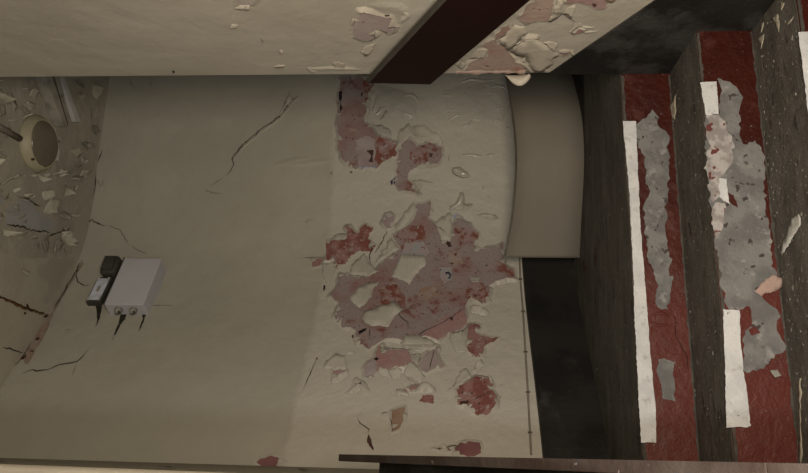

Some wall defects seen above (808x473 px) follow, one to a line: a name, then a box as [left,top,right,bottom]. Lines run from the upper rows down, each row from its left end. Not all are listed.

peeling [349,6,402,56]
peeling [455,0,617,86]
peeling [0,77,104,260]
crack [54,259,88,308]
crack [212,93,300,185]
peeling [305,74,519,435]
peeling [636,110,673,309]
peeling [704,78,801,378]
crack [3,344,86,376]
peeling [657,358,676,402]
peeling [429,439,484,457]